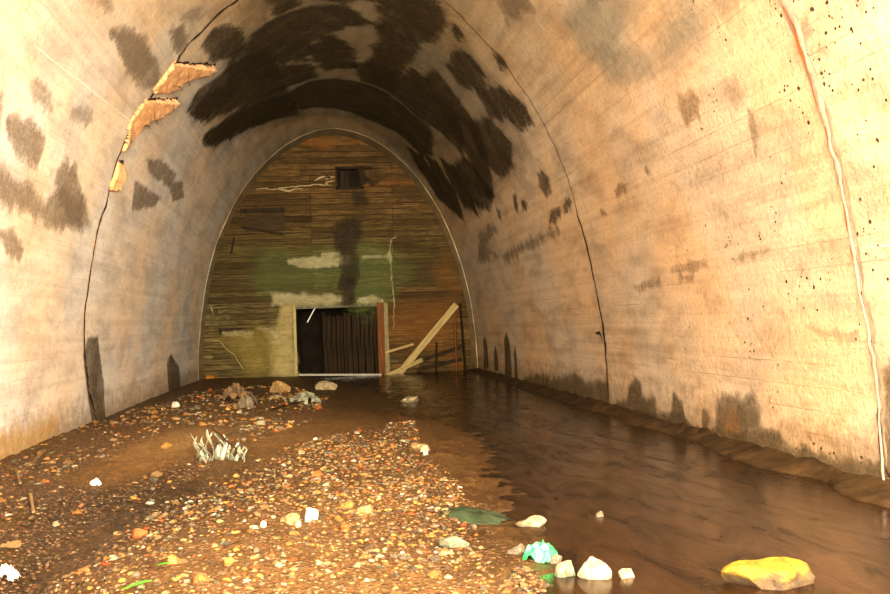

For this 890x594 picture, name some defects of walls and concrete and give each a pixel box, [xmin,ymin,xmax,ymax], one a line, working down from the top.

leakage [112,31,159,88]
corrosion [783,6,818,107]
leakage [1,229,23,260]
leakage [6,118,44,166]
leakage [0,162,87,229]
leakage [132,182,158,209]
spalling [108,61,217,192]
leakage [149,160,184,200]
leakage [187,0,570,261]
crack [444,1,609,399]
leakage [223,218,391,377]
leakage [483,334,890,480]